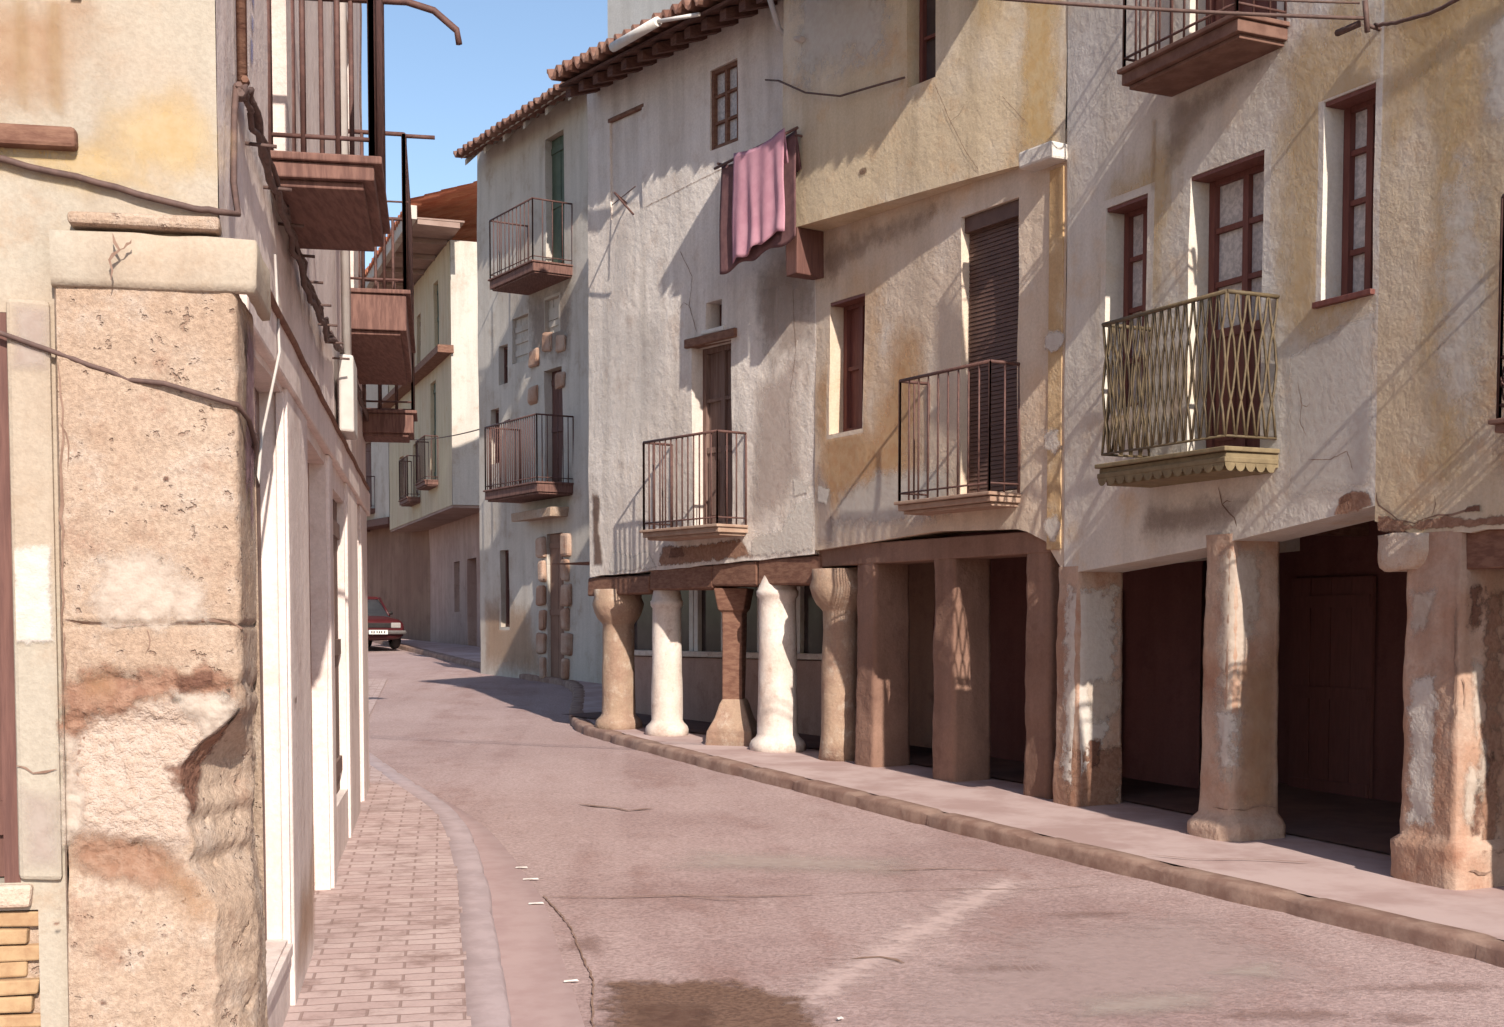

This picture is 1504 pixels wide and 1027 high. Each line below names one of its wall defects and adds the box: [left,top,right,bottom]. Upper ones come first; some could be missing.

peeling [18,311,42,363]
spalling [1334,491,1504,533]
peeling [14,546,52,643]
spalling [31,663,235,858]
peeling [1061,585,1122,807]
peeling [1407,676,1439,825]
peeling [1464,585,1504,840]